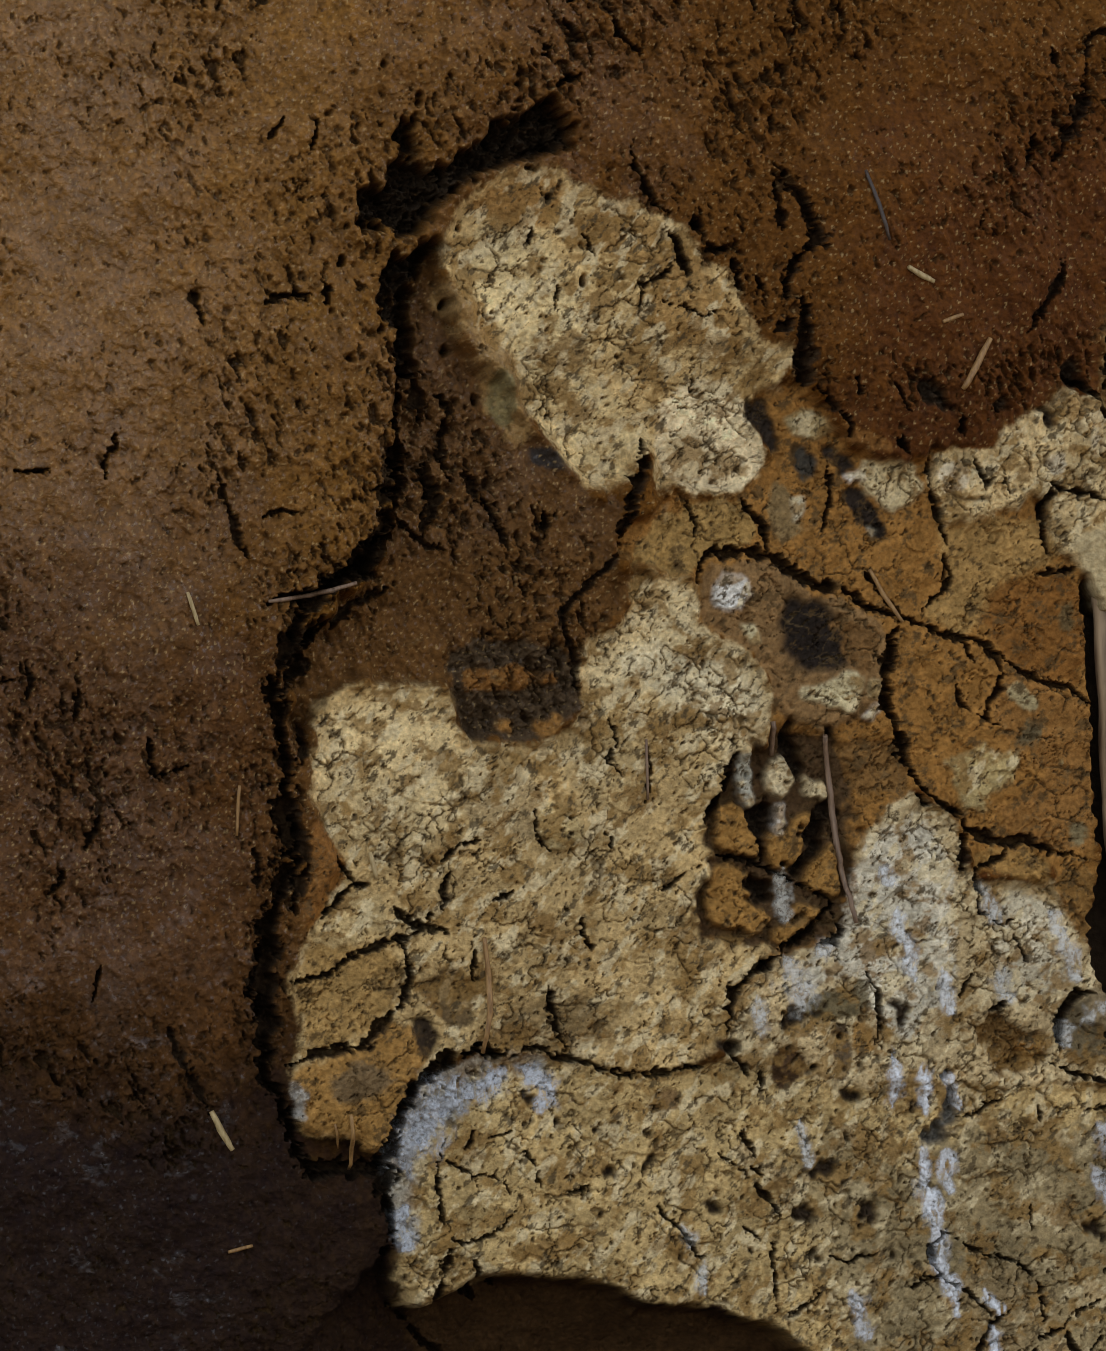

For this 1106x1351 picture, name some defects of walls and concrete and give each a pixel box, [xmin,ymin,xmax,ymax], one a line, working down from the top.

crack [628,151,1106,963]
spalling [286,93,1106,1351]
crack [243,373,848,1351]
leakage [395,1064,555,1171]
crack [865,972,885,1040]
leakage [918,1067,962,1114]
crack [958,974,1008,1012]
crack [1052,987,1106,1111]
leakage [392,1204,414,1252]
leakage [919,1147,961,1316]
leakage [983,1288,1006,1351]
crack [909,1233,1106,1351]